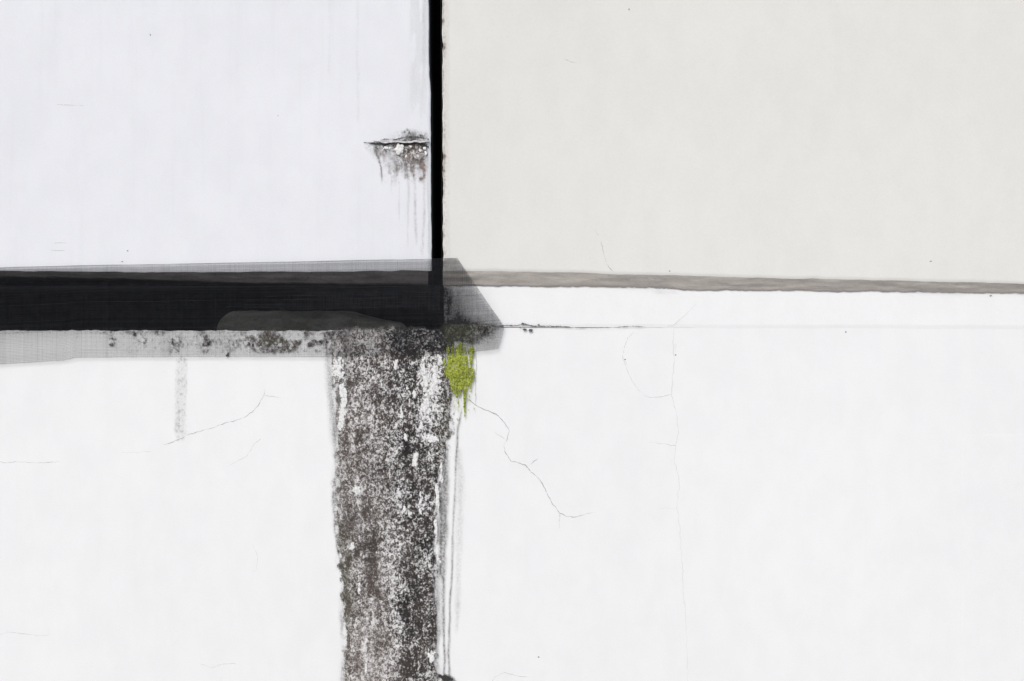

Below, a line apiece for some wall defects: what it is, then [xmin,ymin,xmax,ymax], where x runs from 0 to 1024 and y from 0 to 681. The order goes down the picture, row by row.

spalling [364,130,430,181]
water stain [326,326,462,681]
crack [470,400,588,527]